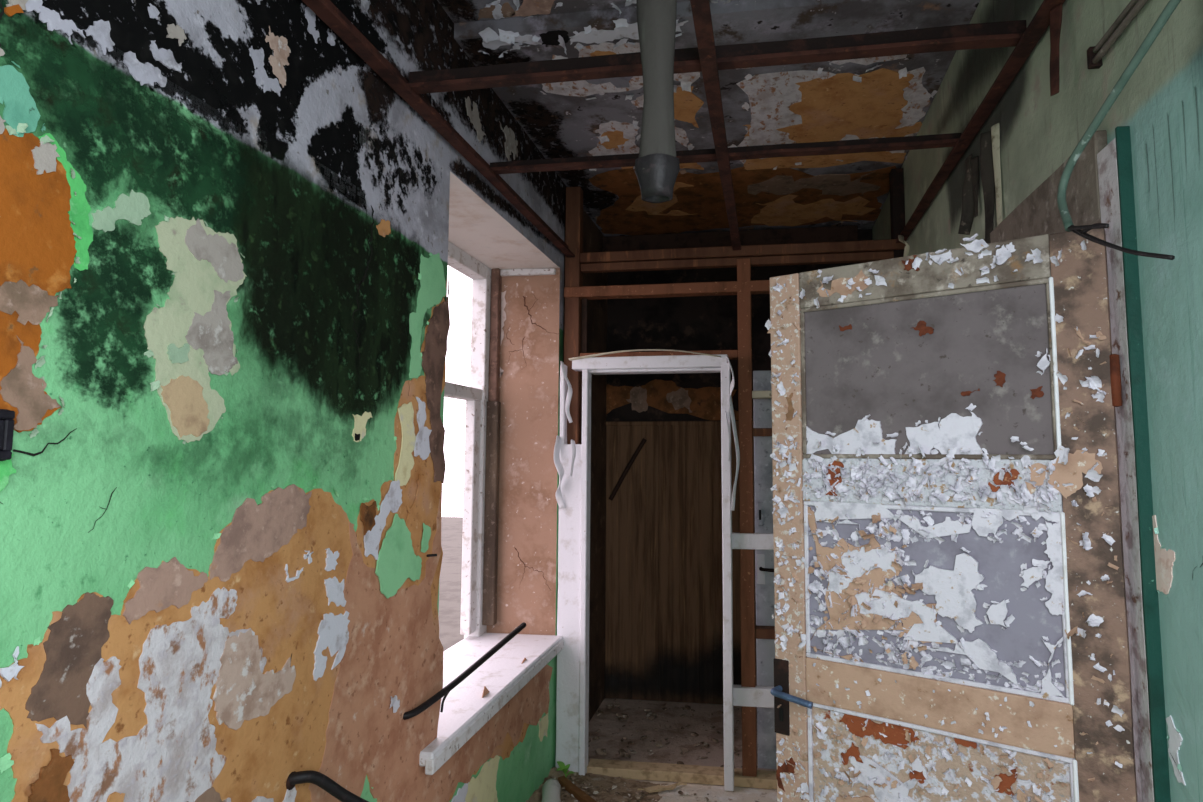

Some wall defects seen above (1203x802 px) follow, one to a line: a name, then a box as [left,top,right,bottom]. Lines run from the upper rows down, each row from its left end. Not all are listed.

crack [13,428,77,456]
peeling [0,48,246,444]
flaking render [0,253,552,802]
damp [0,0,619,424]
peeling [540,54,937,235]
peeling [1152,515,1176,597]